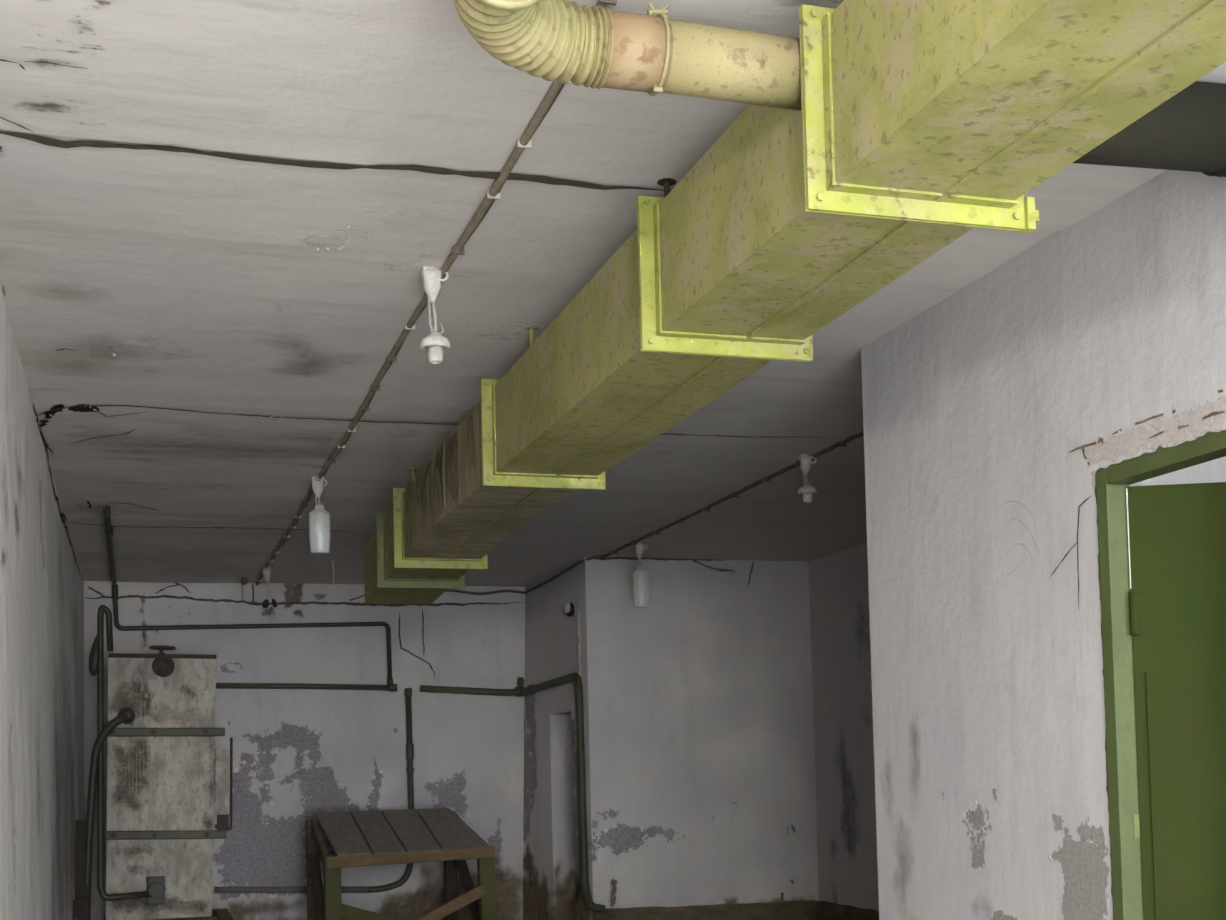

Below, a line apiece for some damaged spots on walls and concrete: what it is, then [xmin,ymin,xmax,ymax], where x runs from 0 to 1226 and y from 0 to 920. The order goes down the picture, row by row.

crack [0,117,671,191]
crack [663,432,752,440]
crack [33,404,520,678]
peeling [213,722,384,900]
peeling [424,770,470,817]
peeling [523,694,538,841]
peeling [569,719,689,901]
peeling [963,782,997,874]
peeling [991,910,1017,920]
peeling [1048,814,1109,920]